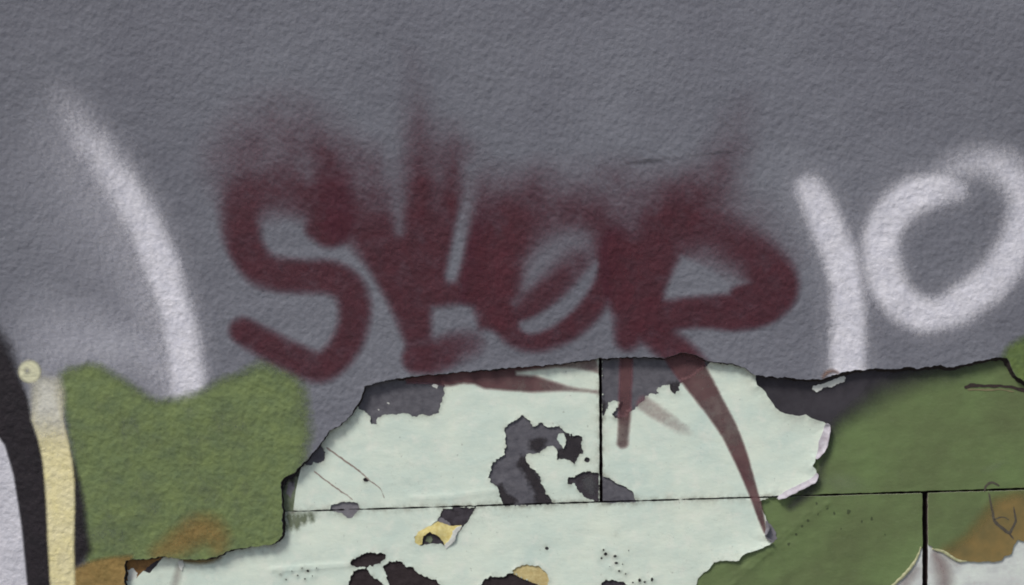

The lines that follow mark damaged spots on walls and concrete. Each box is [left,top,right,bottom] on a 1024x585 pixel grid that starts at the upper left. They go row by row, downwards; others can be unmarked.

flaking render [124,353,1024,585]